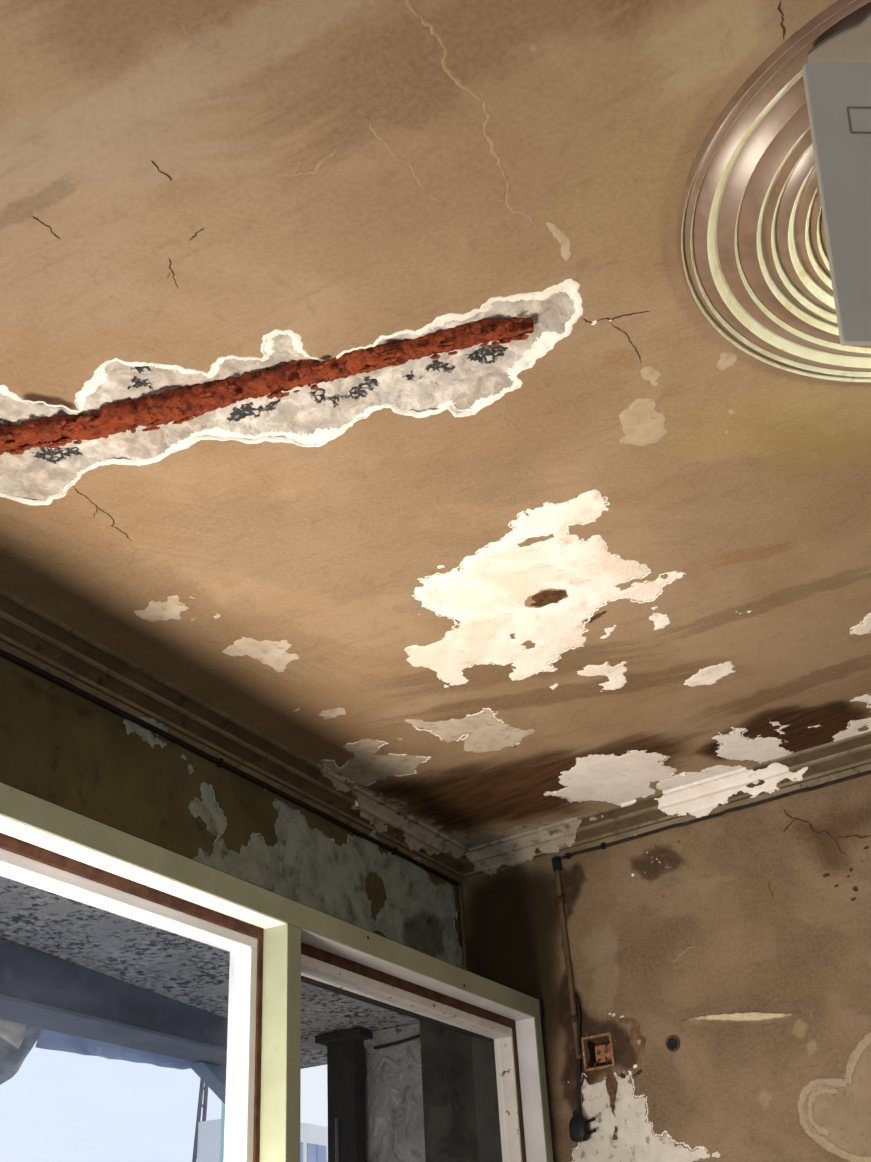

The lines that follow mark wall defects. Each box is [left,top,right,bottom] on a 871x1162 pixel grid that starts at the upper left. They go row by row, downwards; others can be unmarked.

crack [777,1,786,39]
crack [405,0,537,225]
corrosion [25,394,73,410]
spalling [0,279,583,506]
peeling [222,637,299,672]
peeling [405,708,535,753]
peeling [188,721,808,969]
water stain [373,737,678,829]
peeling [404,489,686,692]
peeling [808,692,871,741]
water stain [466,871,562,1162]
peeling [568,1013,720,1162]